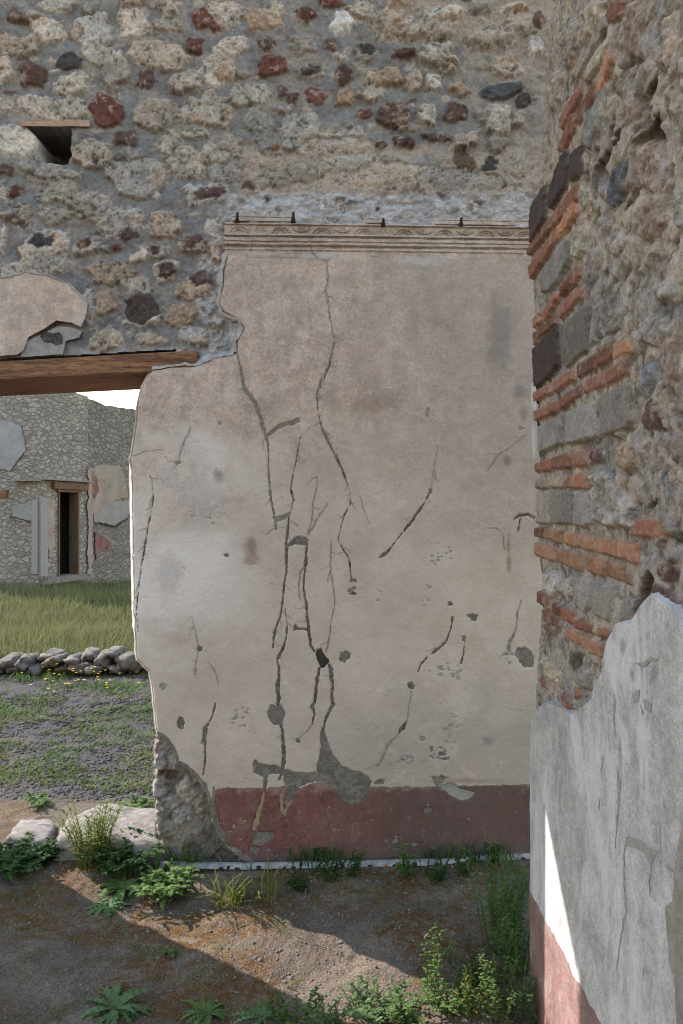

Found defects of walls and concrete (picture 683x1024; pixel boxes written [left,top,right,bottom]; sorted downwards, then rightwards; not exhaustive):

flaking render [40,331,63,345]
crack [96,426,191,632]
crack [189,219,369,838]
crack [379,444,439,558]
crack [364,617,465,770]
spalling [505,639,534,667]
spalling [253,731,385,808]
spalling [432,775,475,800]